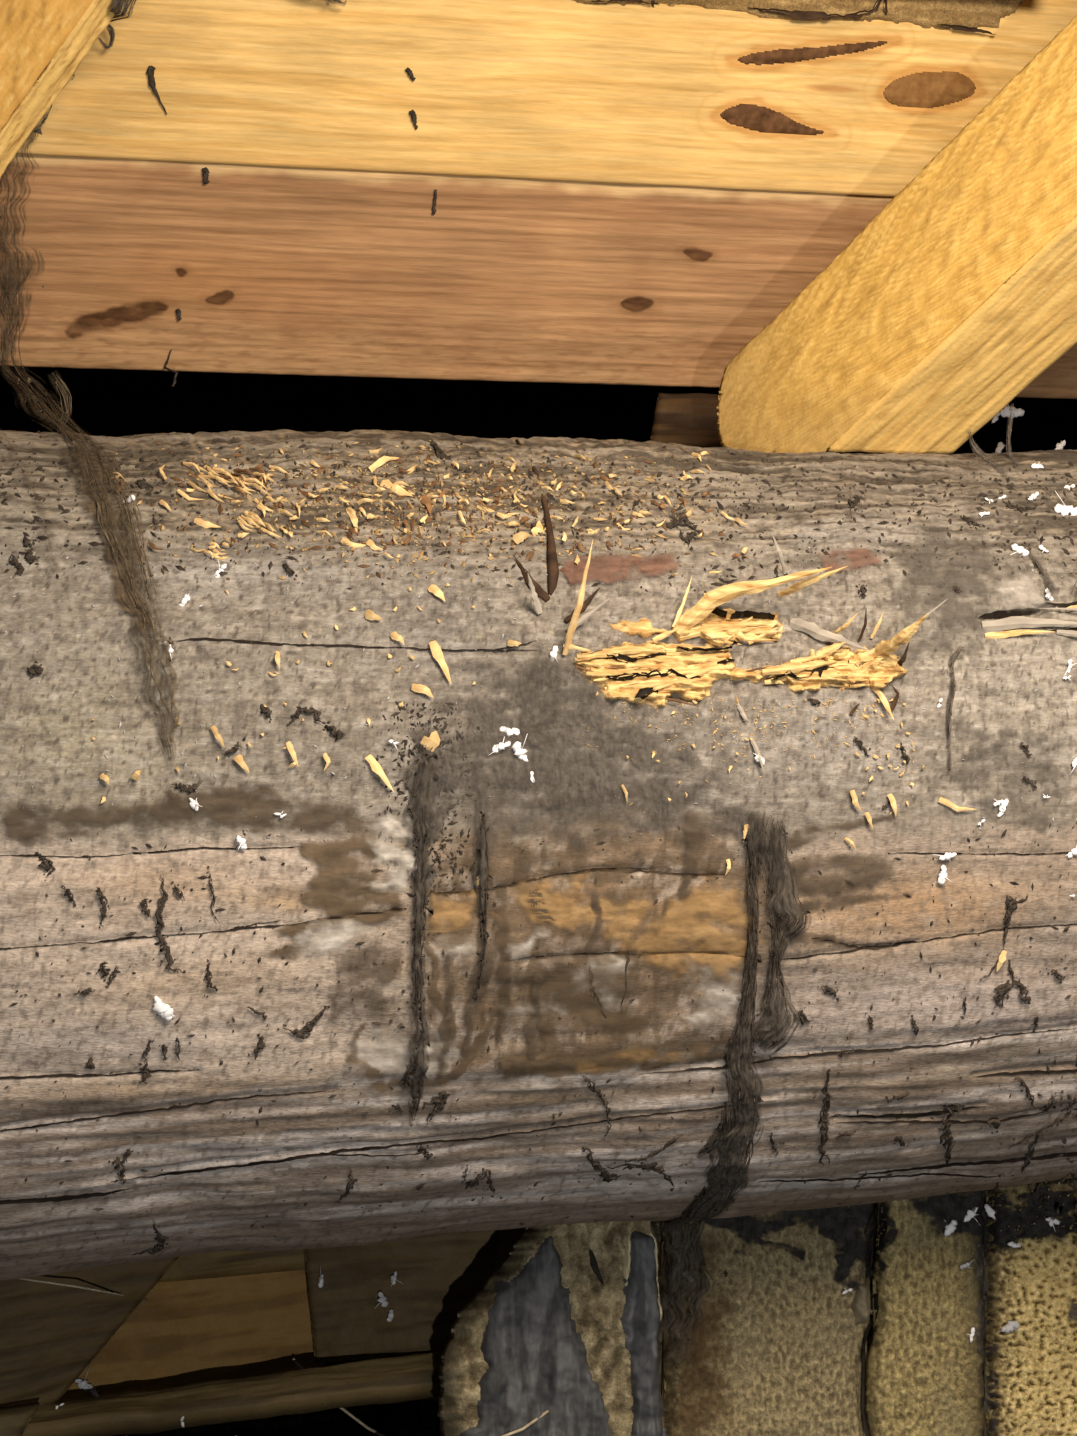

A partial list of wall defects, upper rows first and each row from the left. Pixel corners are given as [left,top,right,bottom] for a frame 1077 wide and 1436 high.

spalling [514,556,550,614]
spalling [562,532,947,720]
spalling [736,703,765,774]
water stain [839,816,895,830]
water stain [786,827,912,911]
water stain [4,733,768,1093]
water stain [793,934,876,949]
crack [643,1028,1074,1074]
crack [0,1069,322,1132]
crack [831,1069,1077,1124]
crack [0,1100,777,1205]
peeling [649,1233,662,1321]